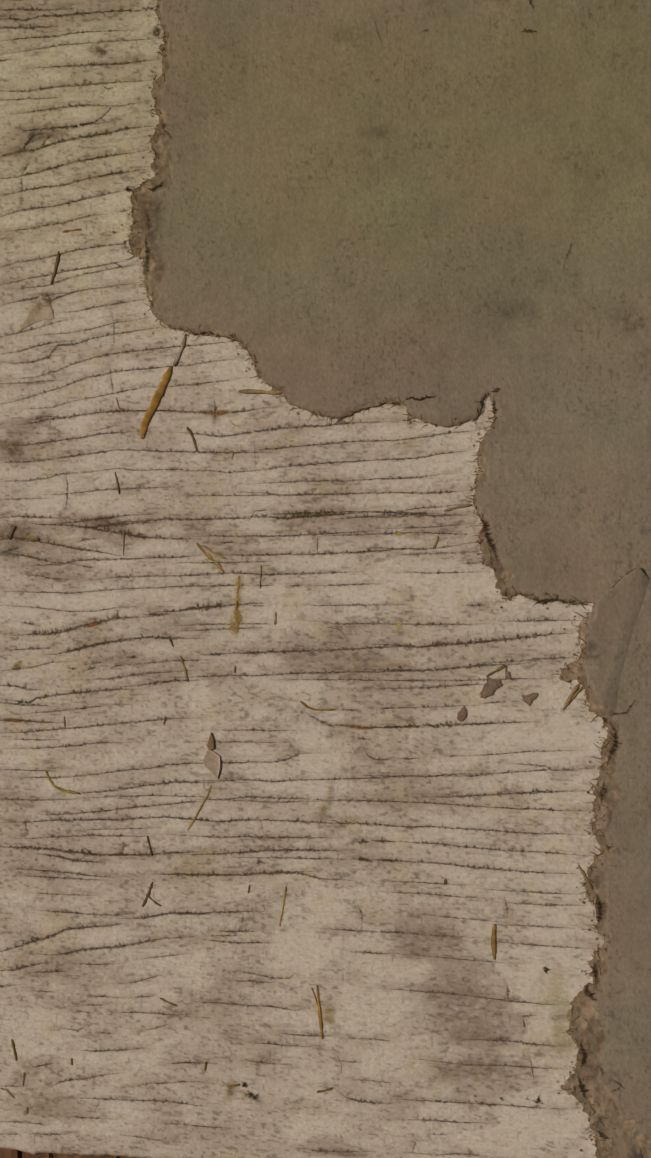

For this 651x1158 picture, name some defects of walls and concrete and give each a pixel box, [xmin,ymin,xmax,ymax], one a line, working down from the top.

peeling [480,668,505,699]